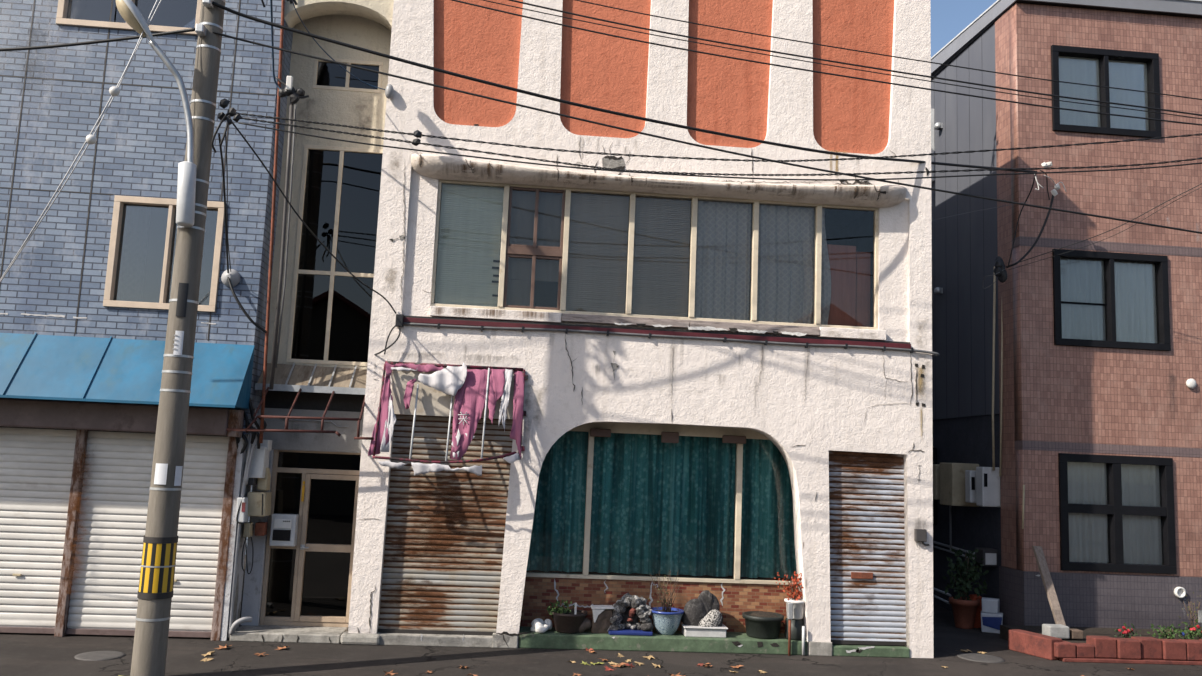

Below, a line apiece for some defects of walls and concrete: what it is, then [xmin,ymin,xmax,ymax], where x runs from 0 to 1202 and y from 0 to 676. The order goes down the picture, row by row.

crack [565,334,583,403]
crack [864,337,913,421]